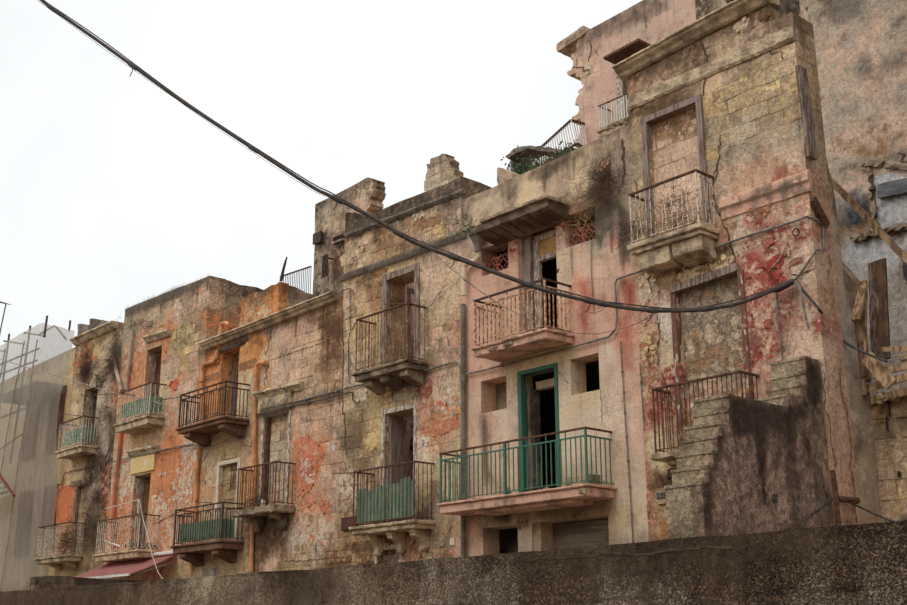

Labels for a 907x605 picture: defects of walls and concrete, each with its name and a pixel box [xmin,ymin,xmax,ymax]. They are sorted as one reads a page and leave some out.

damp [598,209,628,263]
crack [711,138,738,263]
peeling [676,201,804,298]
peeling [639,273,672,367]
damp [99,422,109,461]
peeling [293,435,336,497]
damp [731,363,822,501]